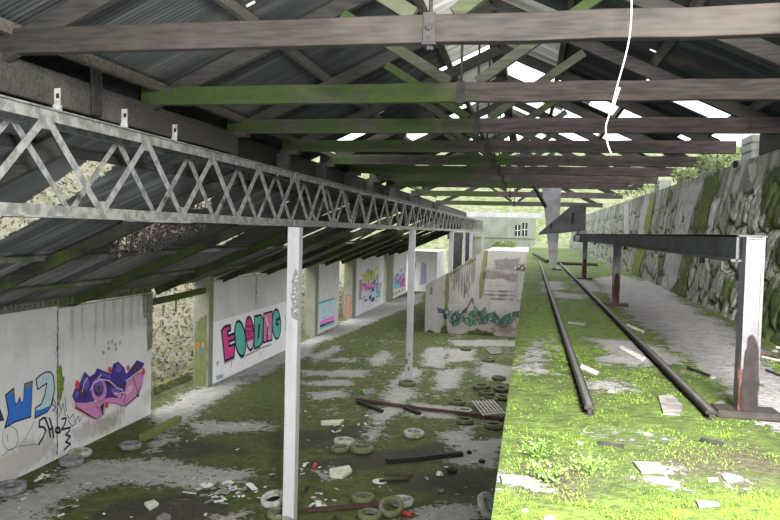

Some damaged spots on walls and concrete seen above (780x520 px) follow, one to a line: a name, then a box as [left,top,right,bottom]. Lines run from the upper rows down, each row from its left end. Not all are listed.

leakage [443,250,525,329]
rust [612,273,620,304]
rust [738,335,760,412]